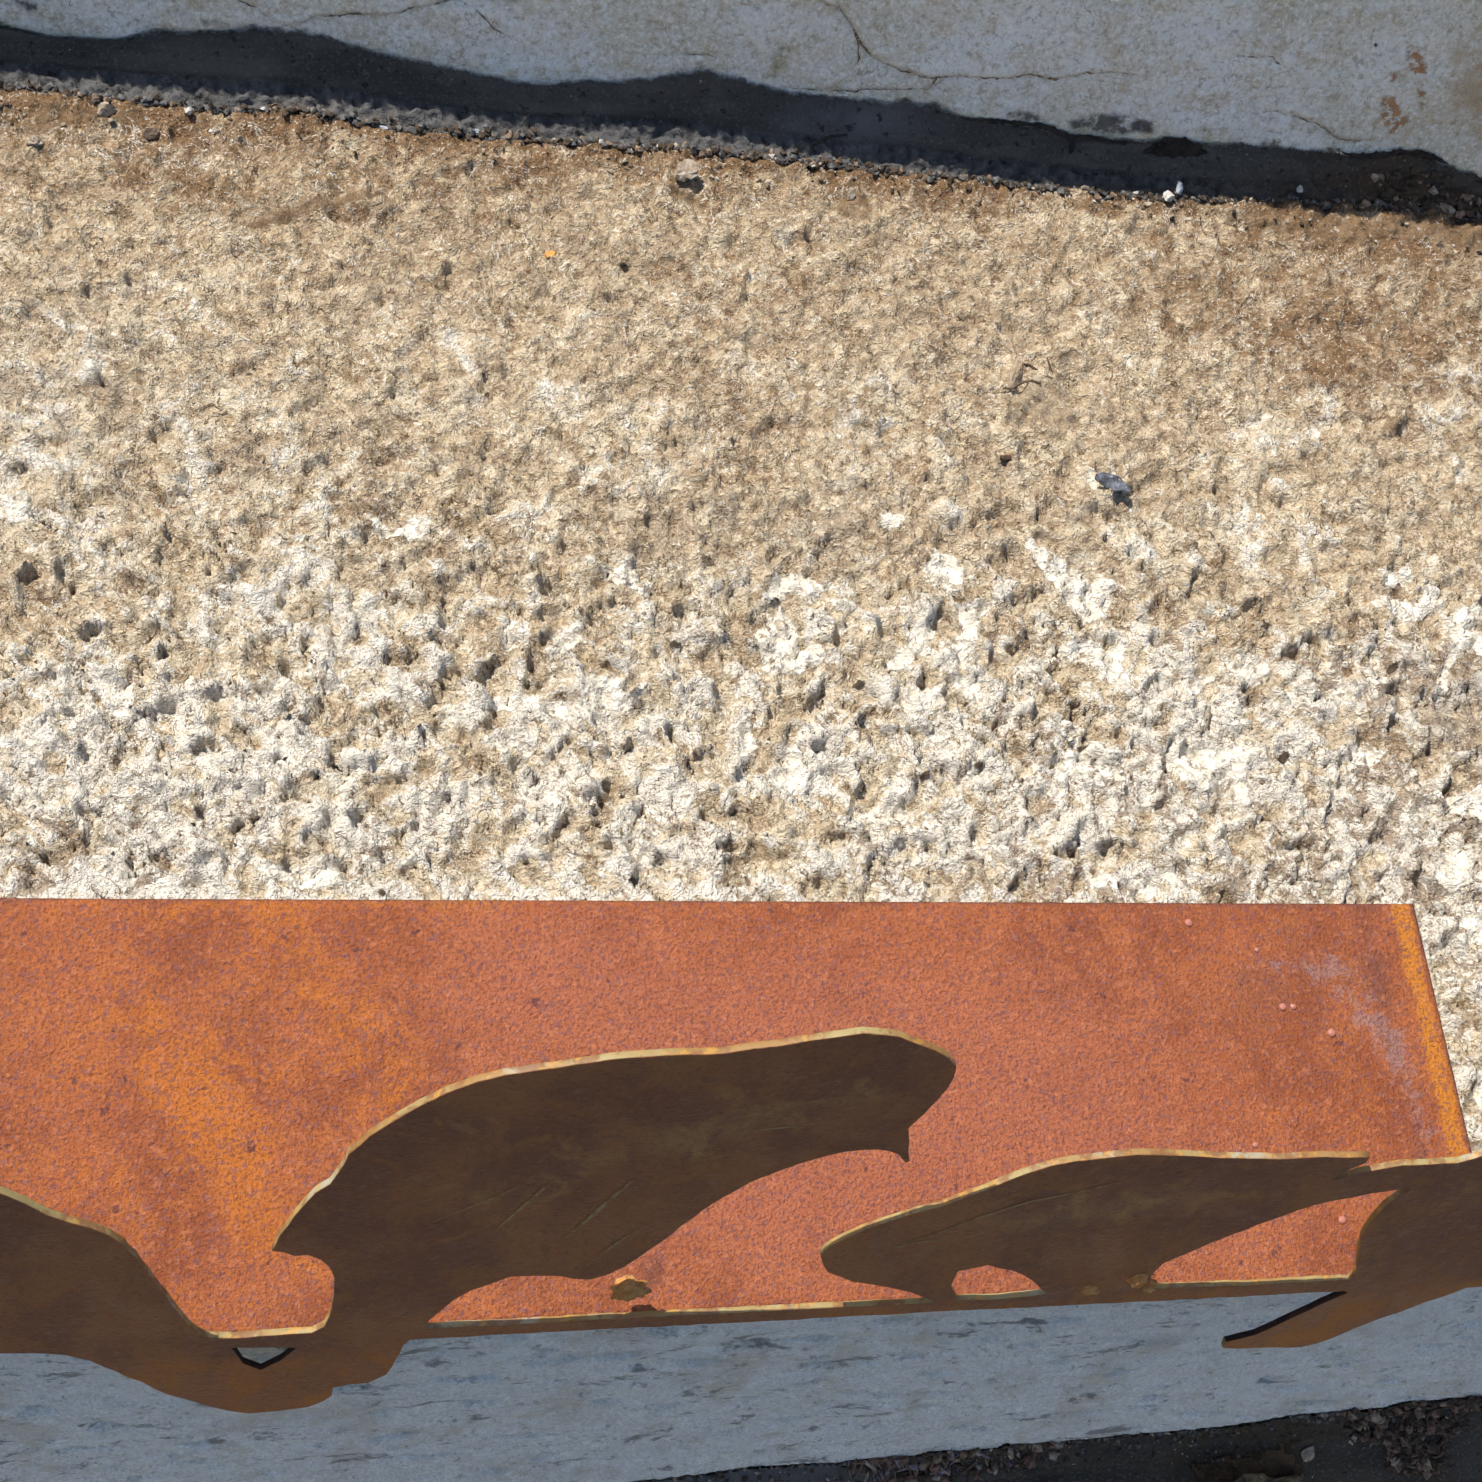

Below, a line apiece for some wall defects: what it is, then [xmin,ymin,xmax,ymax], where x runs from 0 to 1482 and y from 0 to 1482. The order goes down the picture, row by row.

crack [239,1,364,28]
crack [400,0,501,33]
crack [790,0,1121,93]
crack [961,117,1139,154]
crack [1263,111,1482,184]